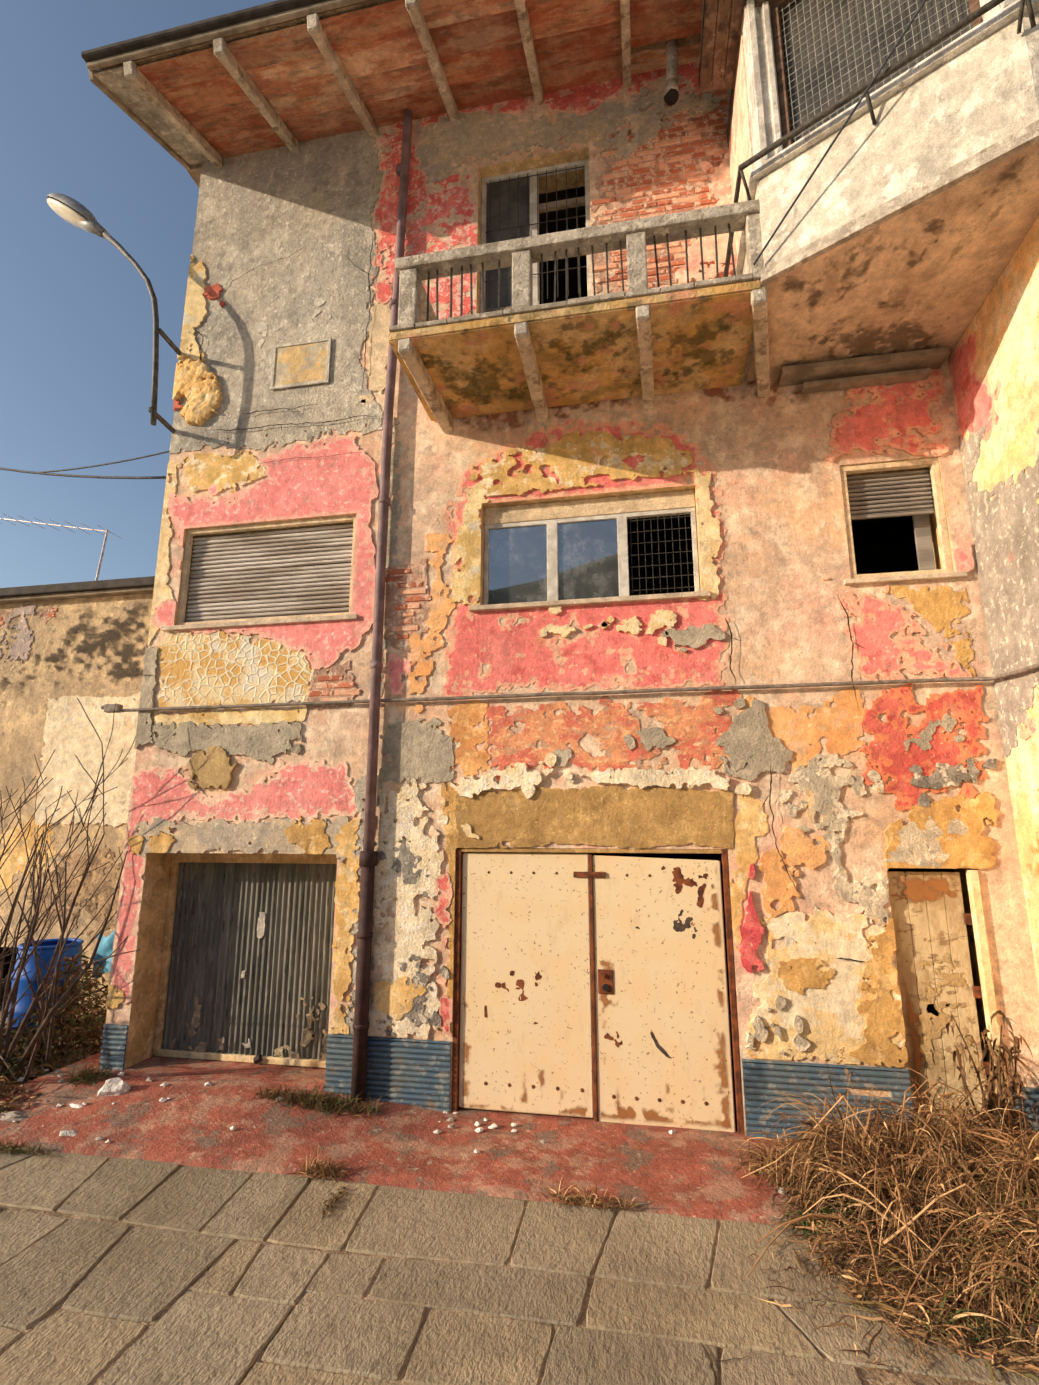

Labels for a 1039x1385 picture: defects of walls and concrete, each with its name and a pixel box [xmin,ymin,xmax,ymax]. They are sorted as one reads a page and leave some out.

crack [216,235,376,464]
leakage [420,354,531,431]
leakage [550,332,621,371]
leakage [548,370,635,419]
leakage [659,314,729,395]
leakage [703,388,731,402]
flaking render [24,61,1039,1069]
leakage [0,605,149,693]
rust [661,866,720,947]
rust [688,1034,730,1127]